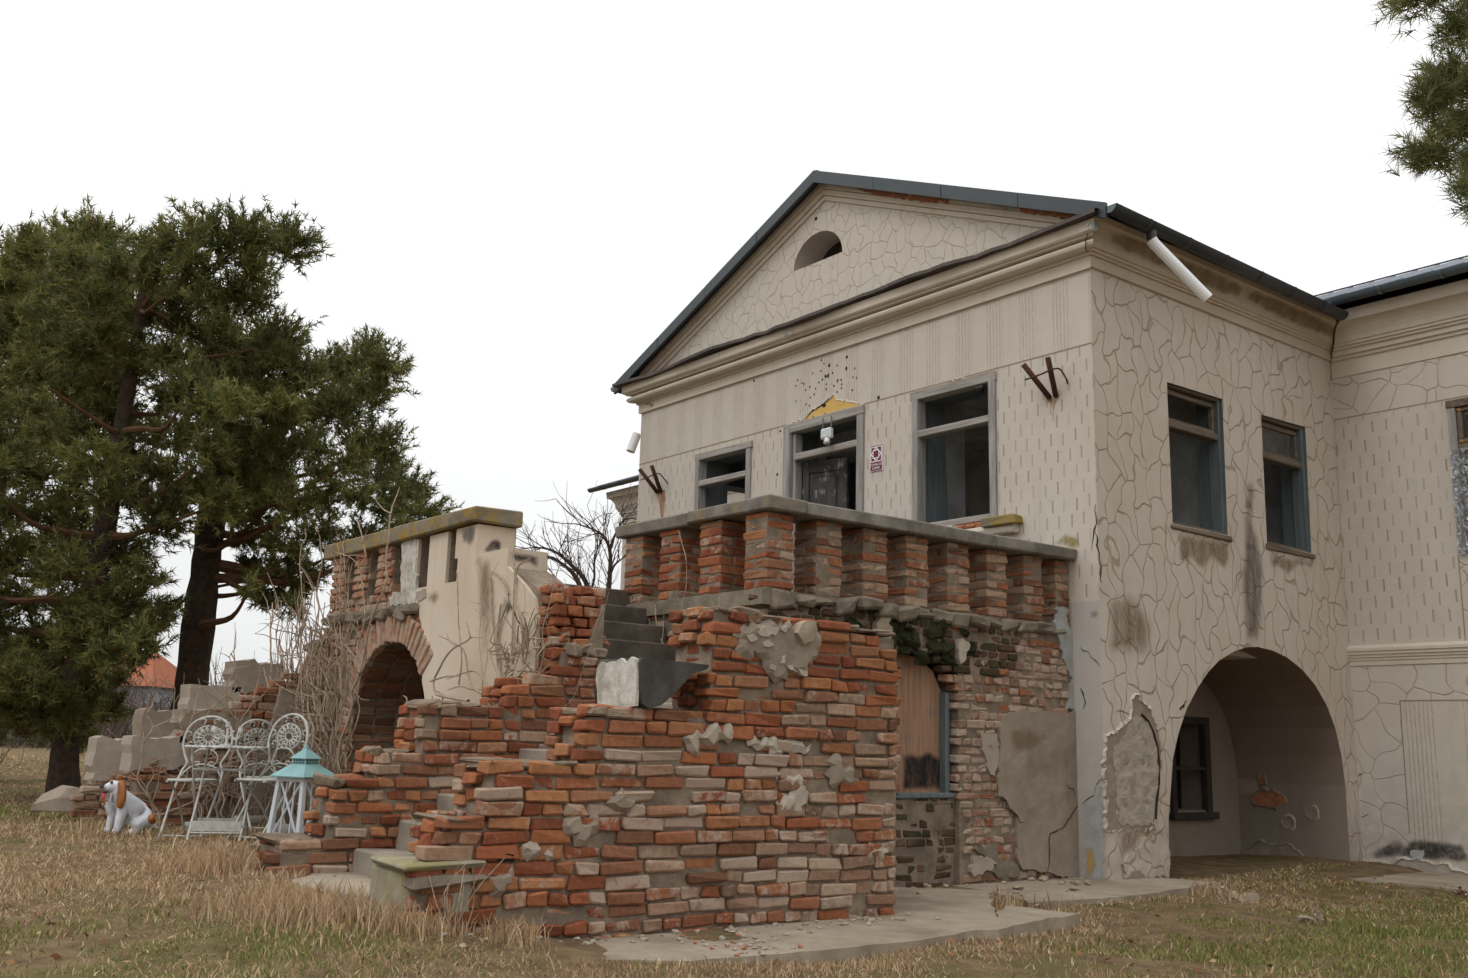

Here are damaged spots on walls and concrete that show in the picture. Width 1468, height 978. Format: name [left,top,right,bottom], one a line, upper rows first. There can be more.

water stain [1245,532,1291,634]
peeling [746,625,808,677]
peeling [1052,606,1075,710]
flaking render [1001,693,1163,896]